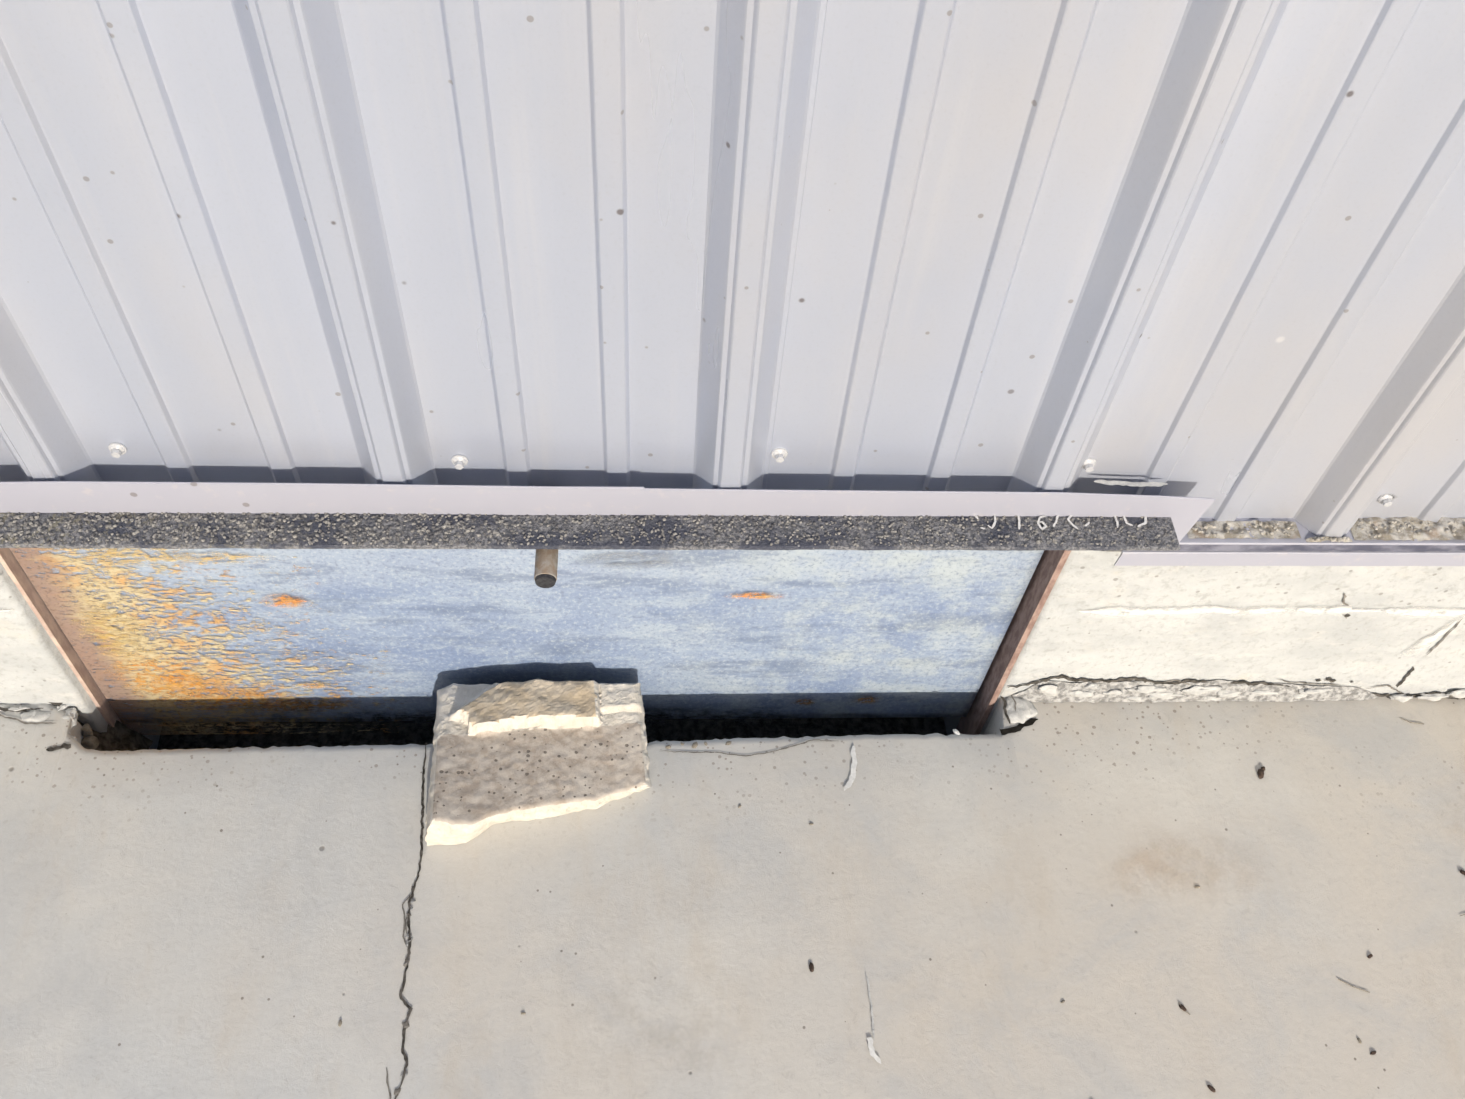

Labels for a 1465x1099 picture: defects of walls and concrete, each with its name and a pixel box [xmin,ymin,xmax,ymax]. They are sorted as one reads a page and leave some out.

crack [0,704,53,725]
corrosion [10,548,405,735]
crack [1008,619,1465,703]
crack [386,743,427,1099]